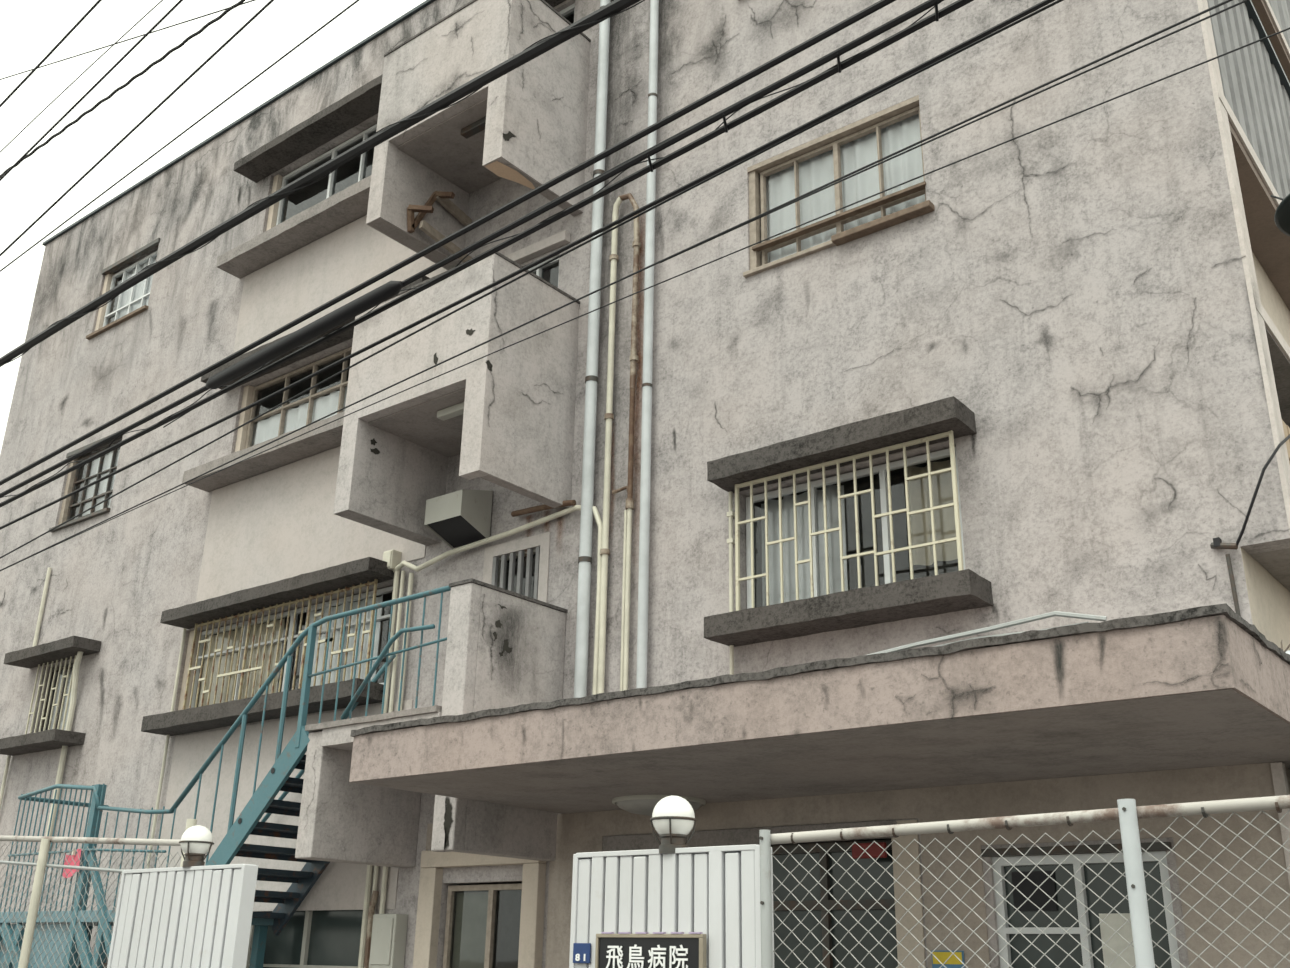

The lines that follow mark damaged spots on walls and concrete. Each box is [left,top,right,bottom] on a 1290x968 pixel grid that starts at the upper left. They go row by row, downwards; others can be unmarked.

crack [1072,354,1155,400]
damp [1055,642,1063,681]